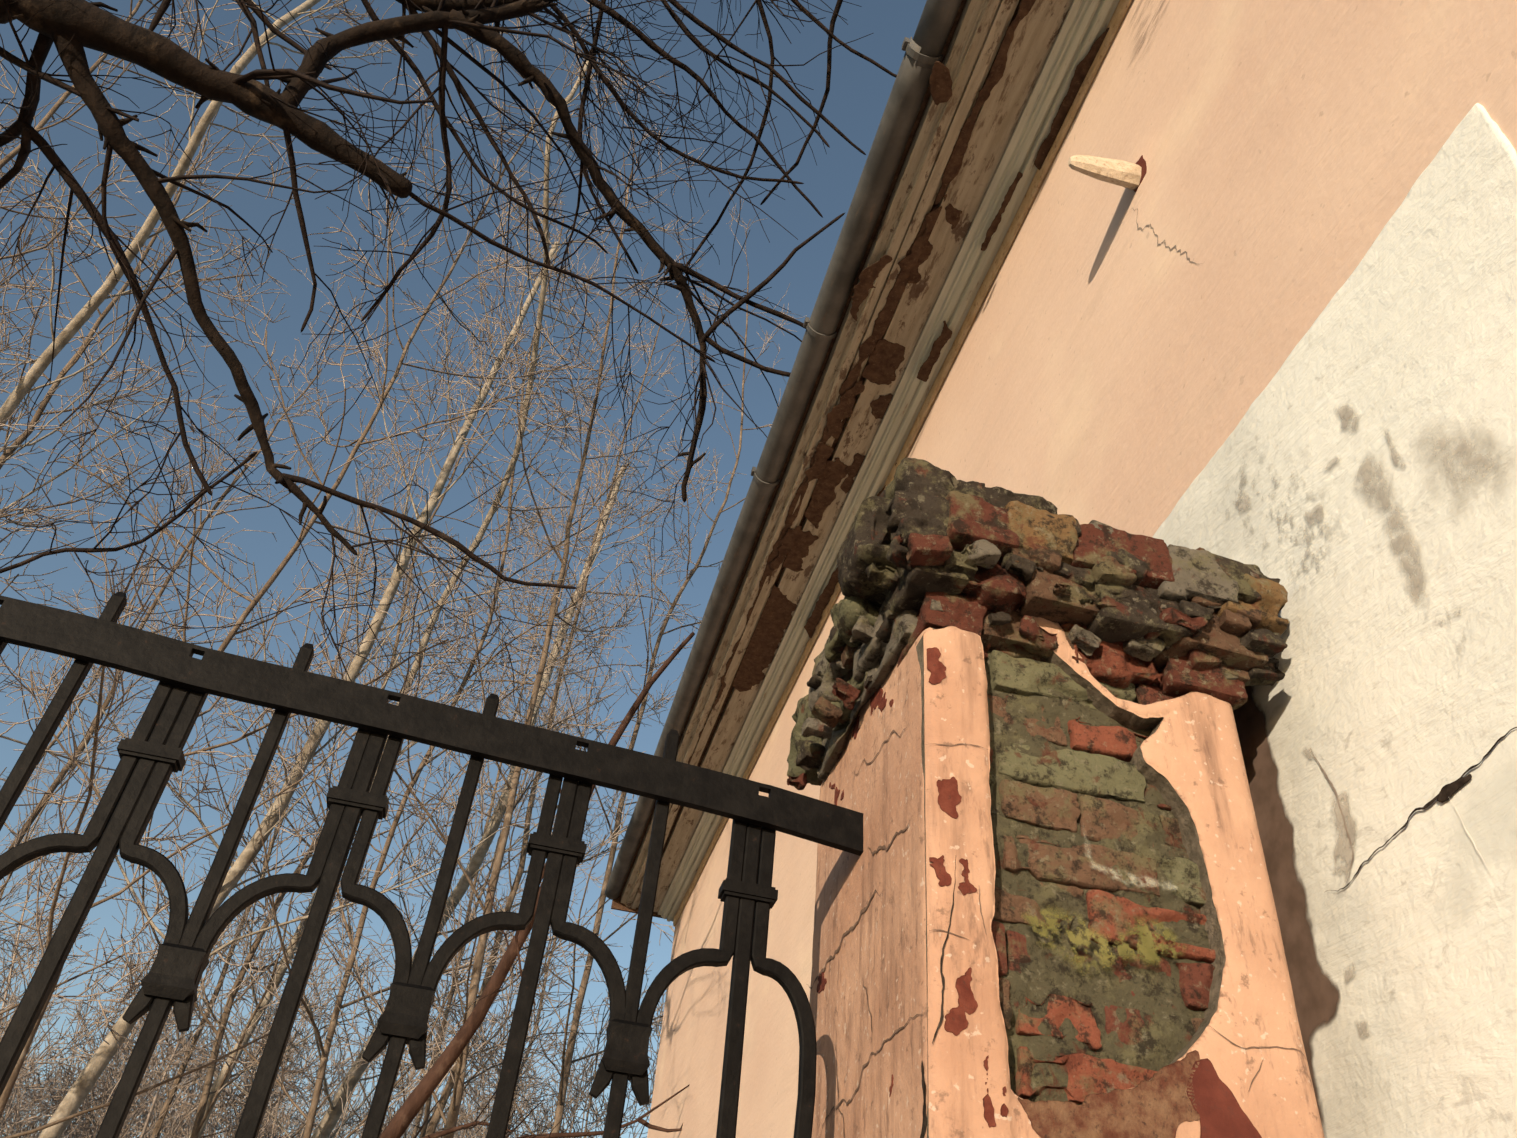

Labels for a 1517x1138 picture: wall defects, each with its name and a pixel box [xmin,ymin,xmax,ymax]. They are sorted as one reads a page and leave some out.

flaking render [981,28,1109,251]
crack [1128,209,1203,264]
peeling [688,0,1036,764]
water stain [1337,405,1357,429]
water stain [1271,505,1323,570]
water stain [1357,432,1424,599]
crack [808,819,911,989]
peeling [929,855,977,896]
crack [1325,727,1517,892]
crack [819,858,986,1138]
peeling [944,967,978,1036]
peeling [983,1050,1262,1138]